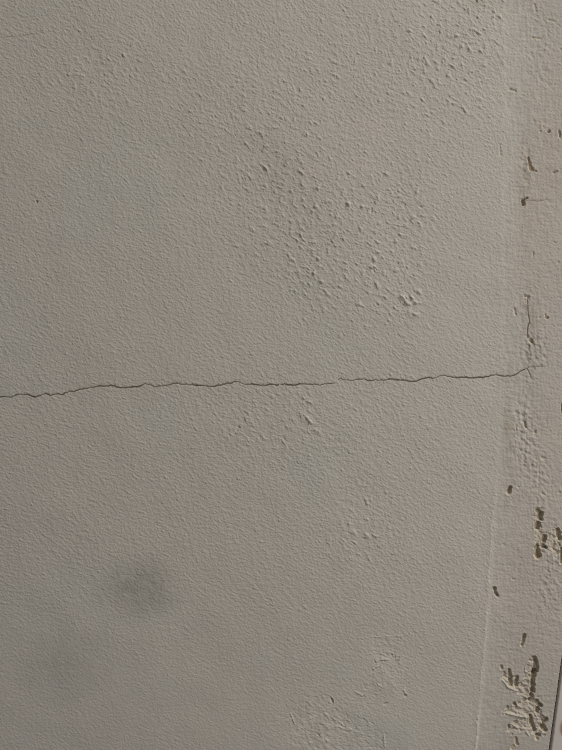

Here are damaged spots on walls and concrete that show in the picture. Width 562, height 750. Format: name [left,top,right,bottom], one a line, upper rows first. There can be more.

crack [0,299,542,398]
spalling [531,507,562,565]
spalling [499,654,549,750]